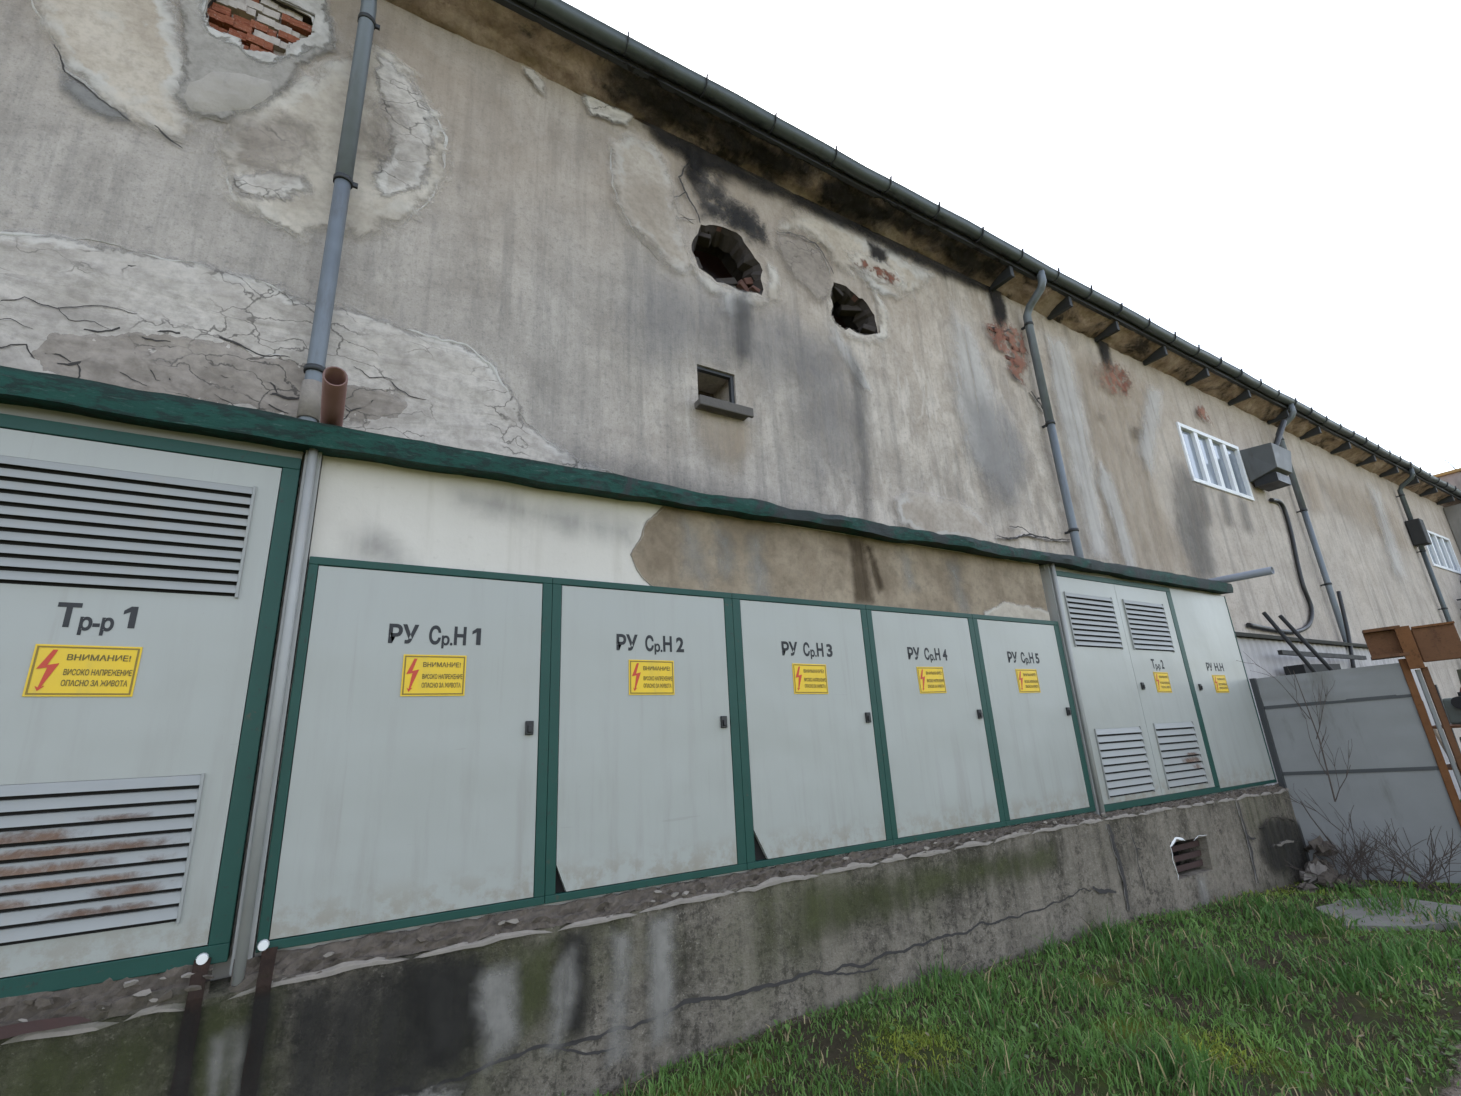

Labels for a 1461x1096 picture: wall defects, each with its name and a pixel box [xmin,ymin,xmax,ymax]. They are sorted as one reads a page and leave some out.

peeling [31,0,448,239]
peeling [582,95,932,389]
leakage [868,243,887,263]
crack [0,296,180,386]
crack [204,336,299,414]
crack [343,366,426,420]
peeling [630,492,1048,615]
rust [0,833,152,917]
leakage [288,963,515,1096]
spalling [0,783,1289,1045]
leakage [652,921,672,1041]
crack [394,824,1146,1094]